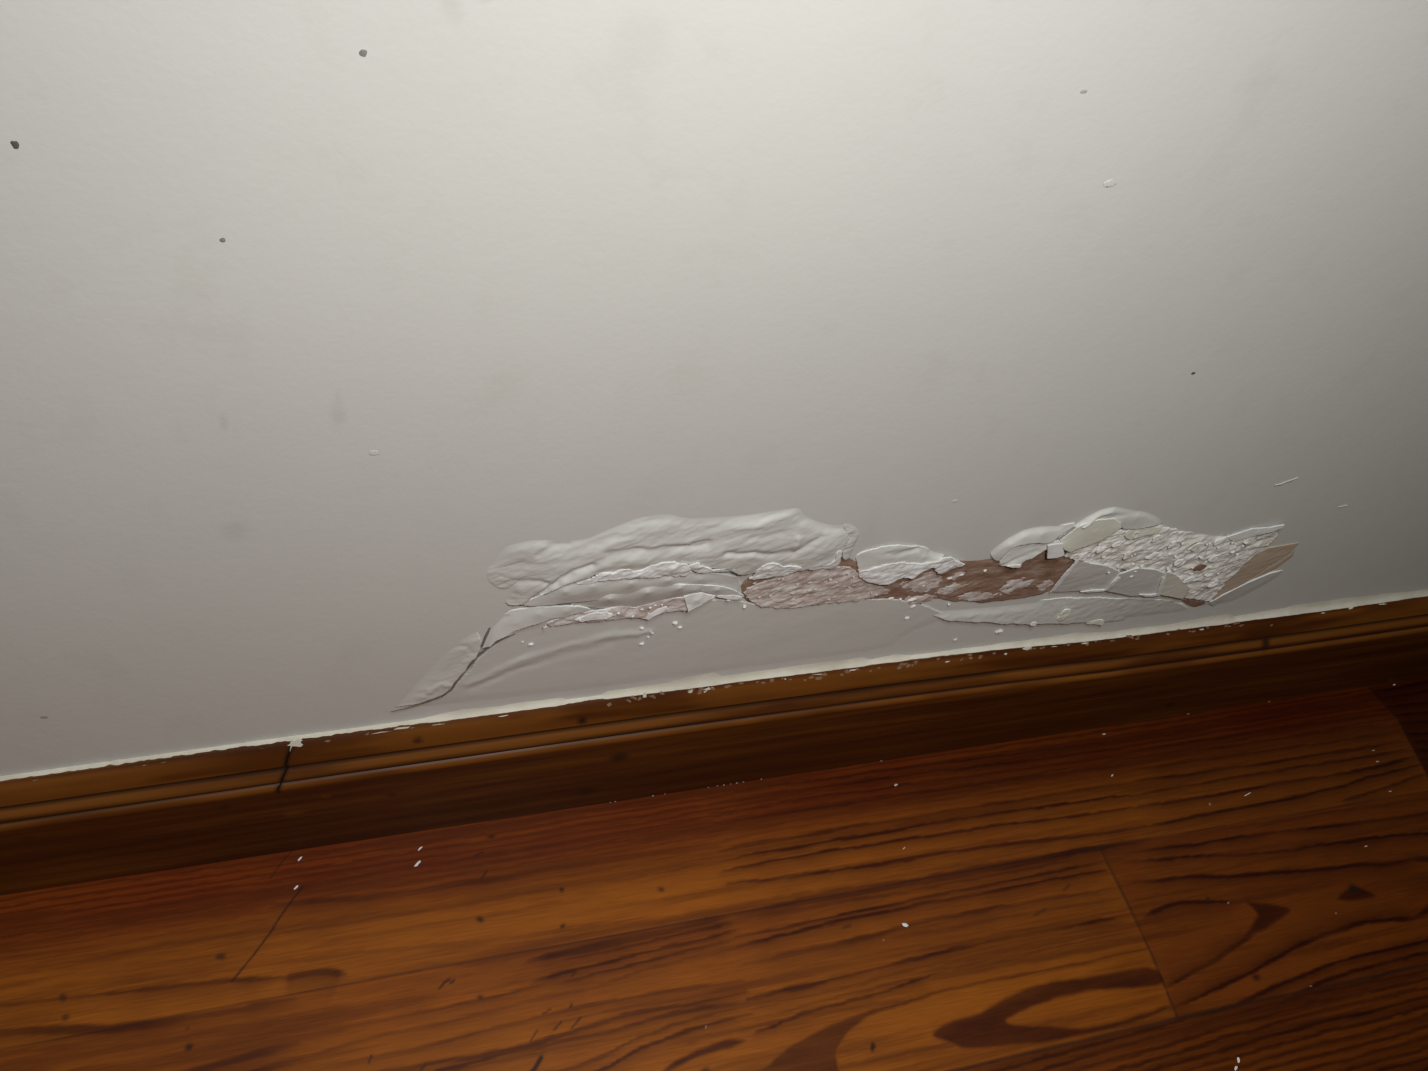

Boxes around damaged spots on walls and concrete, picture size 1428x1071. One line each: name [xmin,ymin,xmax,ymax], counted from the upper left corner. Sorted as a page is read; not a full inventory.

peeling [741,507,1299,619]